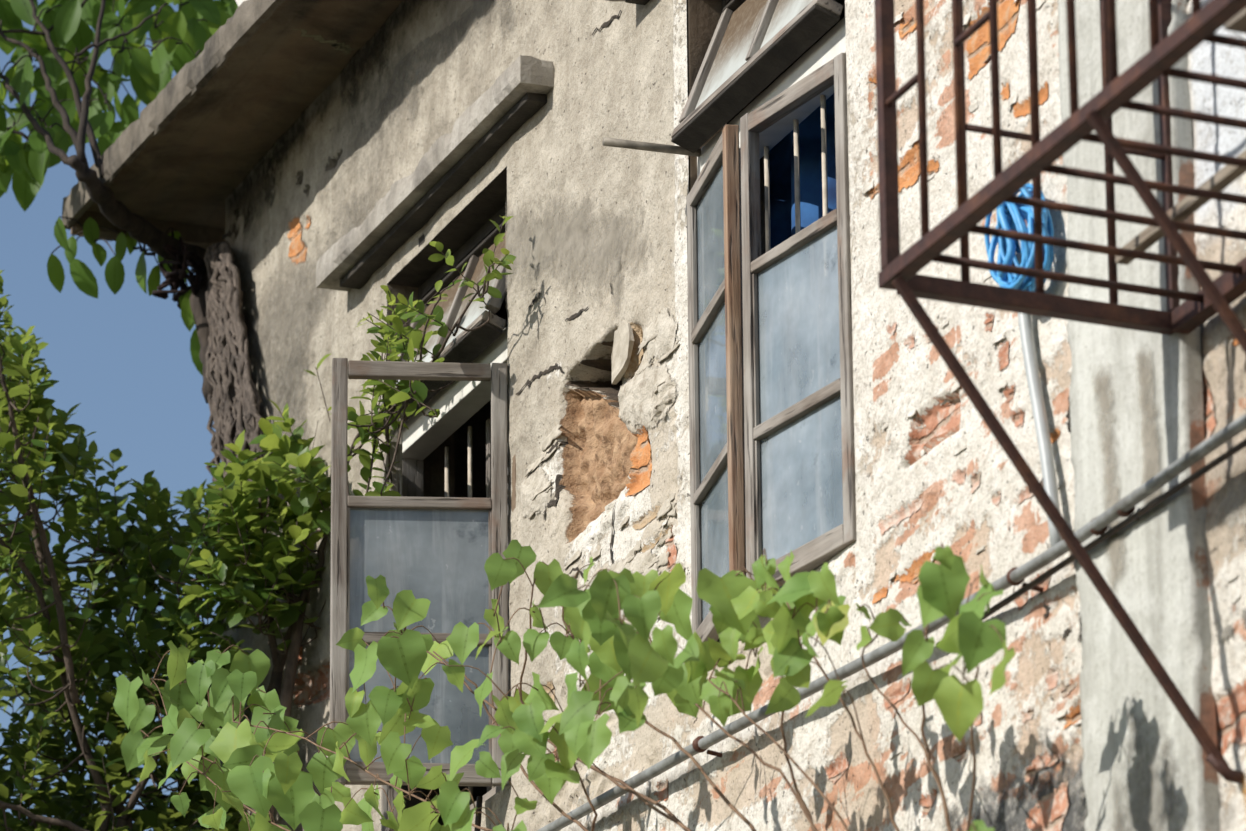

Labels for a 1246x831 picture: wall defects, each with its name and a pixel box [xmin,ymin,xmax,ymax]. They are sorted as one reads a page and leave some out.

crack [592,10,621,35]
spalling [963,0,1020,80]
damp [229,103,325,230]
spalling [898,131,940,192]
crack [516,363,563,395]
crack [539,441,569,519]
spalling [525,322,685,577]
spalling [905,382,981,494]
spalling [984,313,1025,428]
damp [1094,373,1123,588]
damp [1136,352,1161,505]
spalling [1025,782,1069,831]